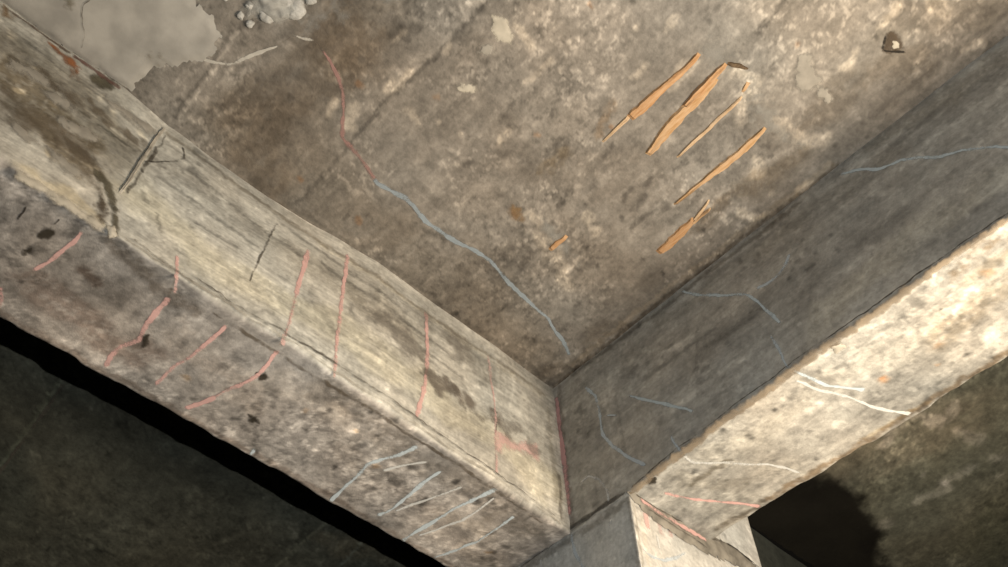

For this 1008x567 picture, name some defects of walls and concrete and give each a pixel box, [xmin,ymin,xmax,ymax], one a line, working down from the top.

corrosion [4,8,120,89]
damp [237,0,317,28]
spalling [882,32,905,53]
crack [204,35,570,355]
crack [186,251,309,409]